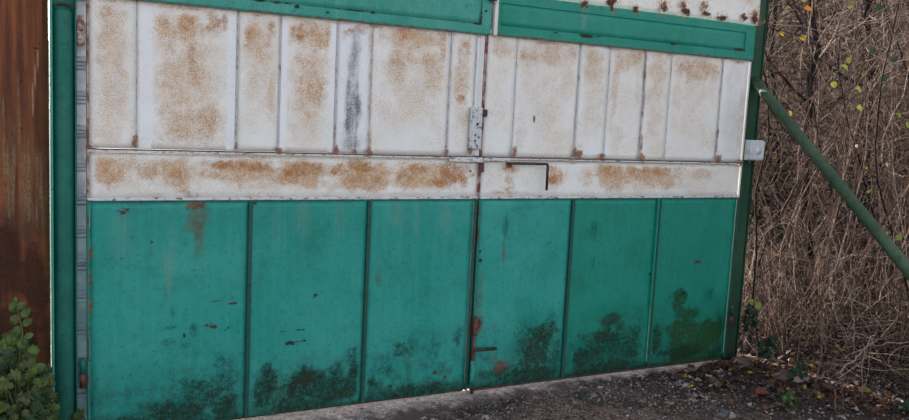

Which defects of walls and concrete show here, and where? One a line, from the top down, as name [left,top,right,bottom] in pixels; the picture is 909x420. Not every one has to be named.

corrosion [658,1,726,21]
corrosion [160,16,215,139]
corrosion [292,21,328,119]
water stain [345,81,361,149]
corrosion [95,159,190,192]
corrosion [201,160,323,190]
corrosion [334,139,467,191]
corrosion [586,135,680,190]
corrosion [0,79,49,346]